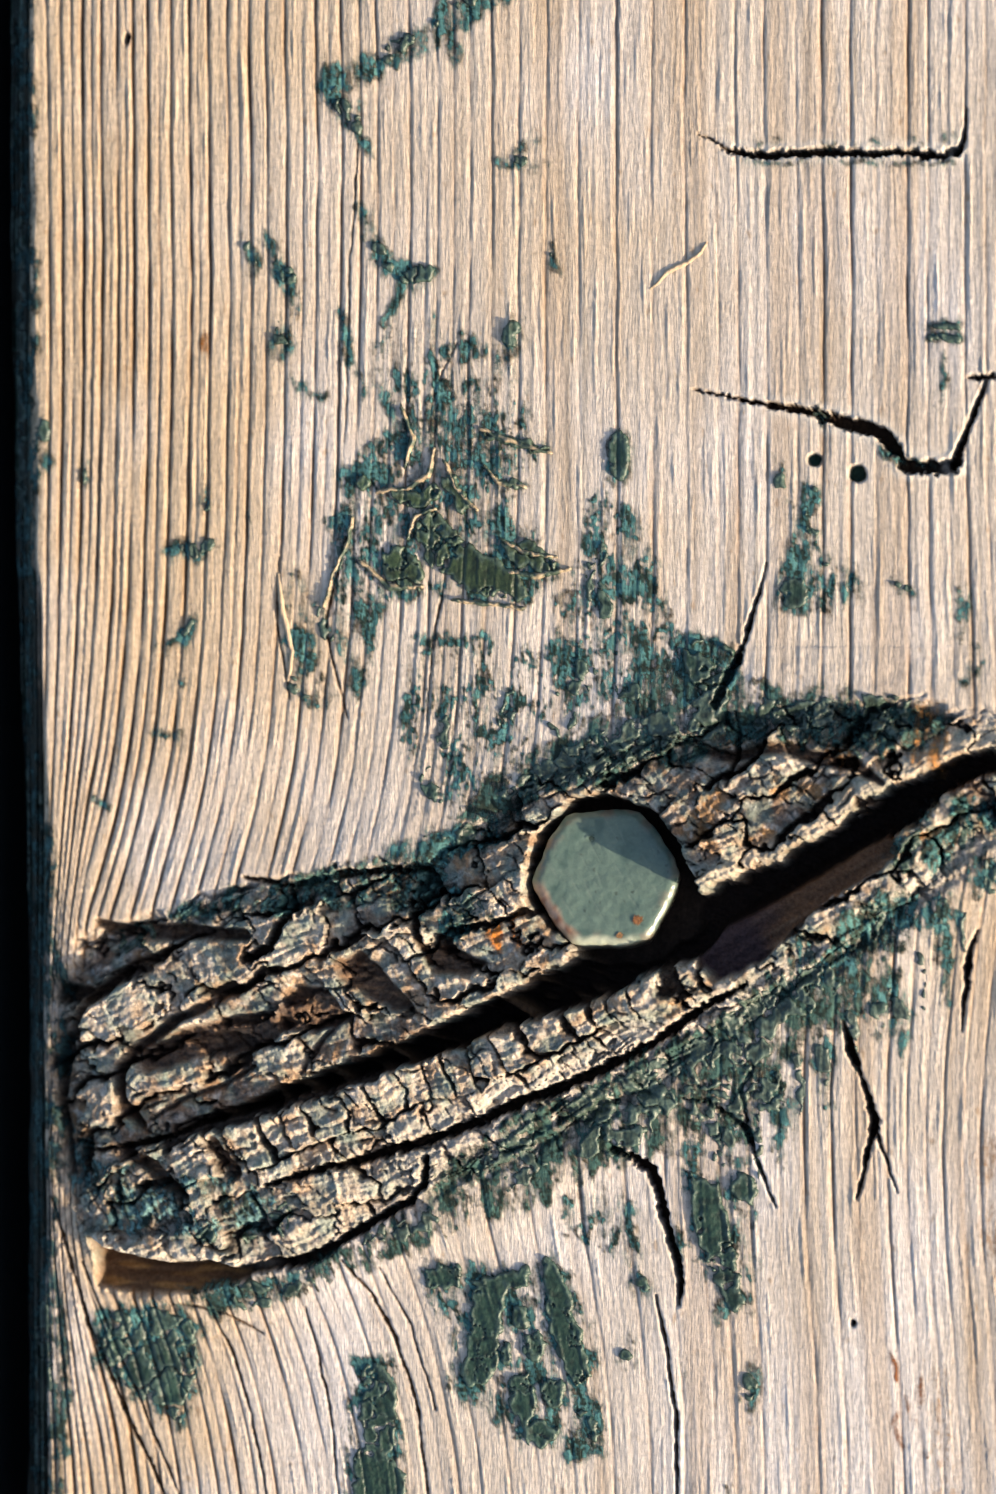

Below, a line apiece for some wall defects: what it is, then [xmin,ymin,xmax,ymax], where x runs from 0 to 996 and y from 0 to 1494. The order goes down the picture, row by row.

peeling [316,0,511,157]
crack [706,109,968,162]
peeling [353,203,440,348]
crack [695,373,996,477]
peeling [117,307,956,954]
crack [730,577,764,670]
peeling [10,0,300,1494]
crack [76,746,996,1153]
peeling [90,794,996,1464]
crack [843,1021,894,1197]
crack [240,983,748,1494]
peeling [344,1354,408,1494]